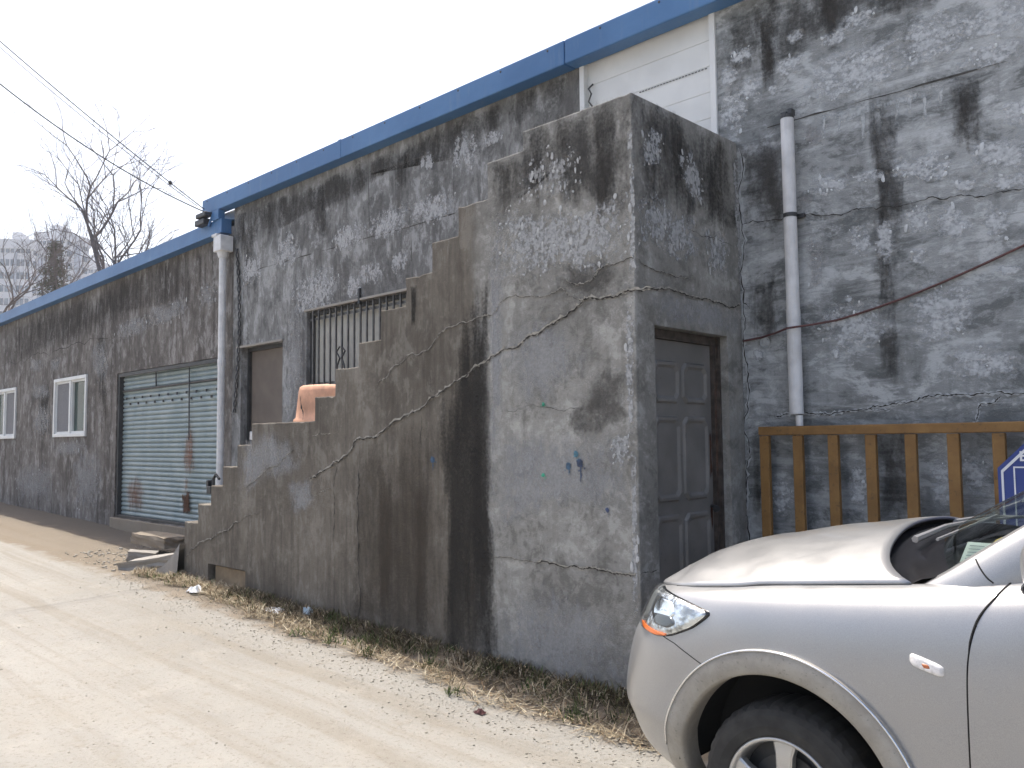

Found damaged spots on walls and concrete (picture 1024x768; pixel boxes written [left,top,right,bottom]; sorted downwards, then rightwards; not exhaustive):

leakage [238,106,499,269]
leakage [495,118,621,214]
leakage [643,112,735,222]
leakage [822,93,927,229]
leakage [939,81,979,143]
leakage [568,265,607,291]
leakage [572,374,621,429]
crack [310,148,1024,622]
rust [182,492,190,513]
leakage [441,277,566,653]